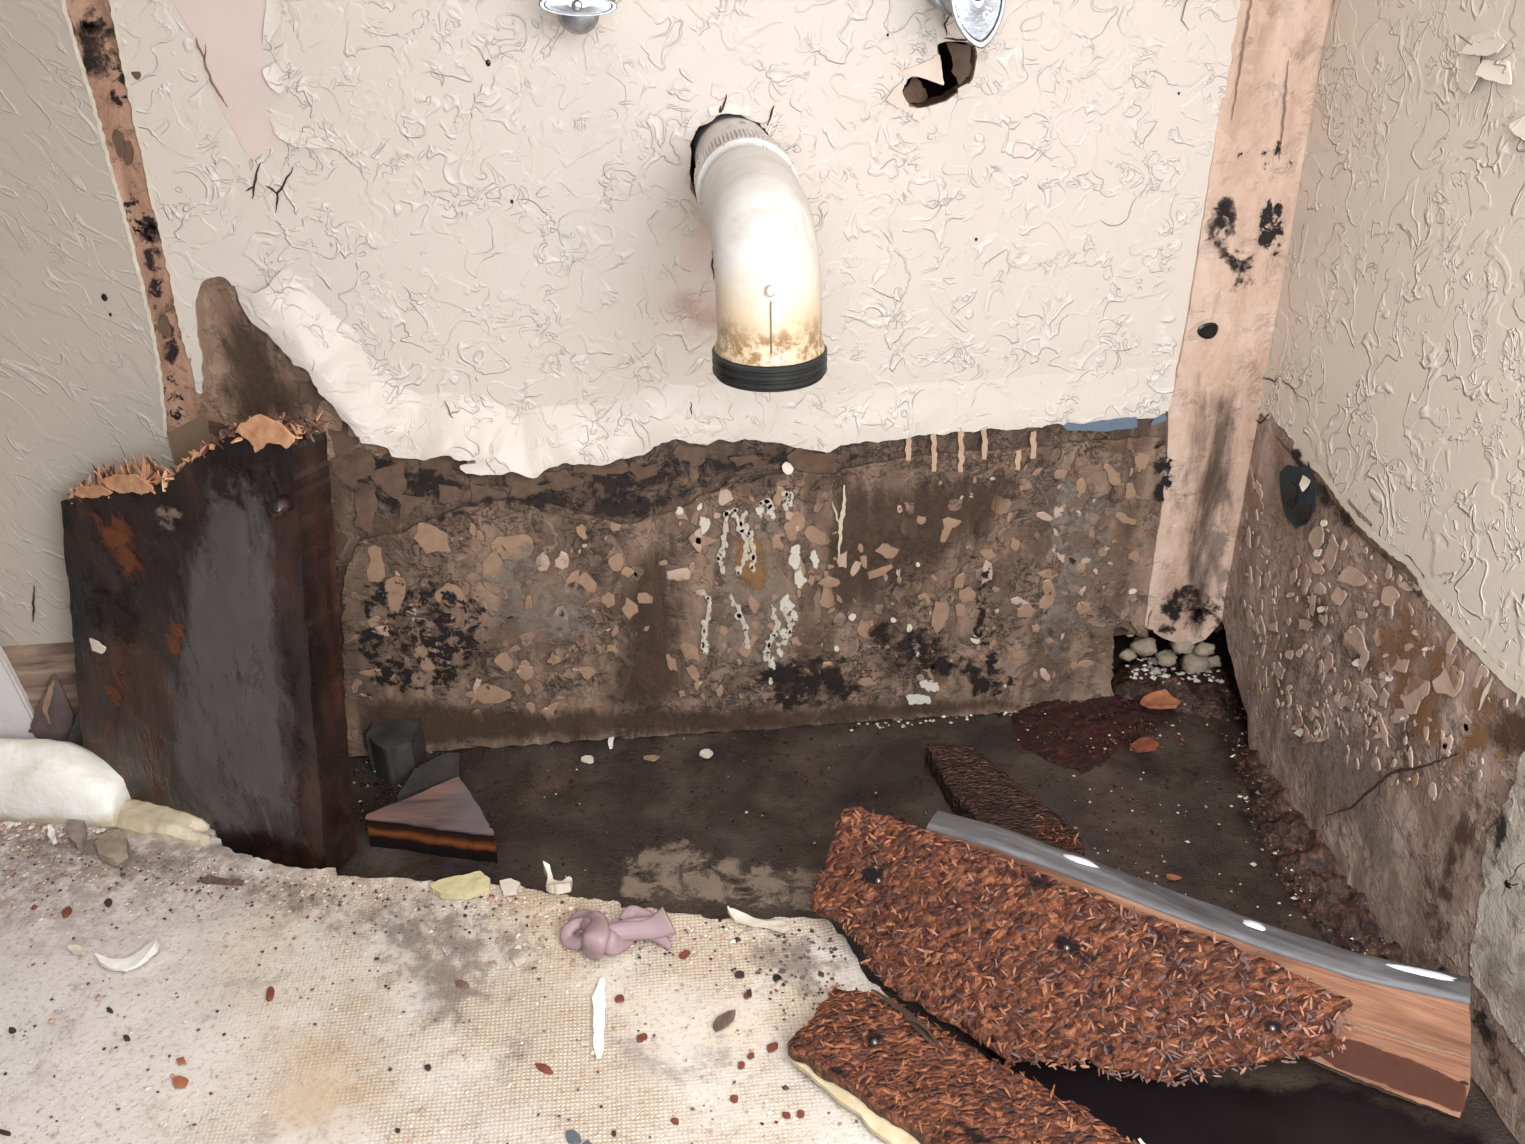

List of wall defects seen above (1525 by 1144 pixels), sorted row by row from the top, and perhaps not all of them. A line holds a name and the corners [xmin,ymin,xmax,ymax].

spalling [886,15,989,122]
spalling [684,94,792,200]
mould [61,0,202,437]
damp [357,448,796,524]
peeling [196,266,1222,757]
damp [830,477,1006,608]
damp [1279,449,1355,533]
peeling [1145,0,1525,1144]
damp [354,547,1017,749]